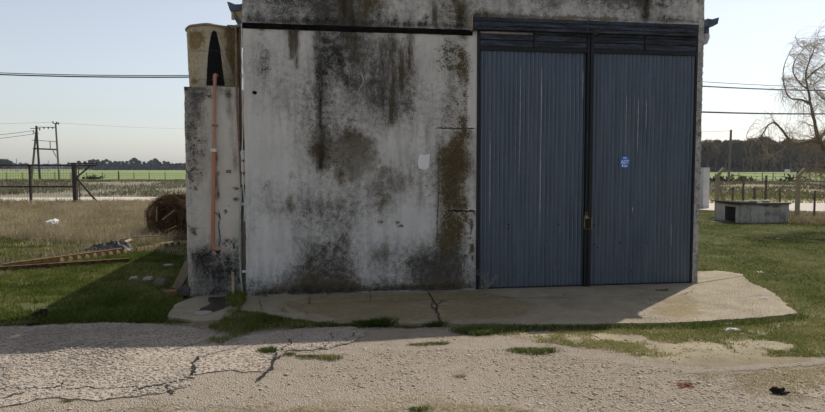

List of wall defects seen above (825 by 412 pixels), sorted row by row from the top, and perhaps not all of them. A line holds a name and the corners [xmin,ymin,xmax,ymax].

leakage [641,0,681,21]
leakage [277,0,467,184]
leakage [191,237,241,312]
leakage [256,231,476,295]